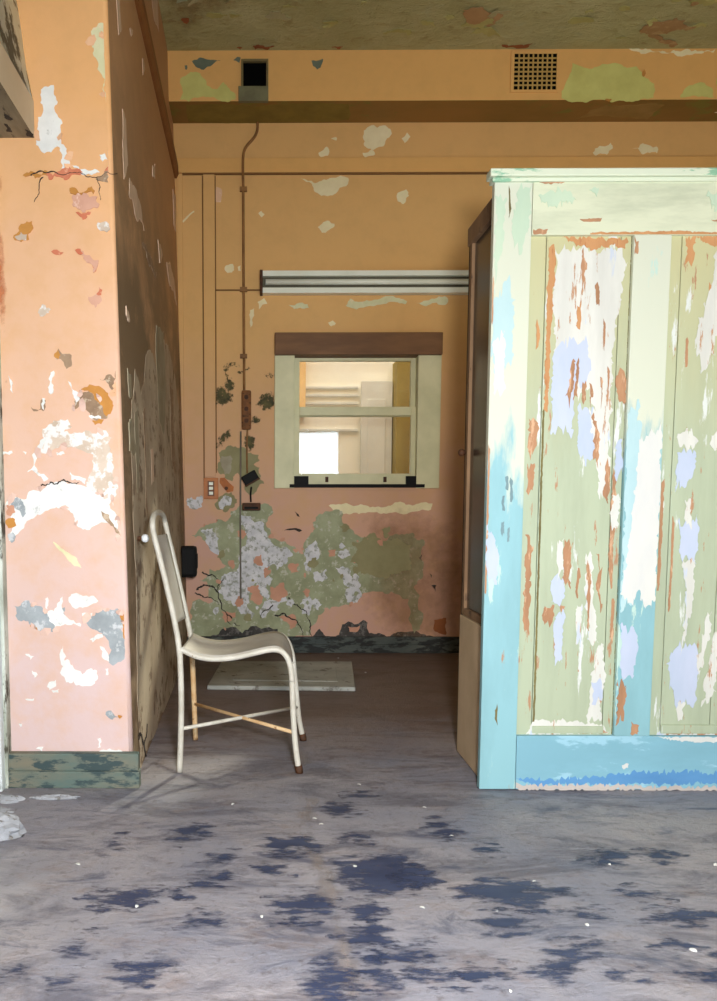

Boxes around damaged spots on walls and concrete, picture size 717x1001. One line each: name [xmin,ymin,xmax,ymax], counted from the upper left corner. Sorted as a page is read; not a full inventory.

peeling [561,63,655,103]
peeling [23,85,110,232]
crack [31,170,117,202]
peeling [301,175,349,196]
spalling [13,221,33,242]
peeling [3,325,447,768]
damp [166,822,214,848]
damp [577,847,690,865]
damp [73,847,243,927]
damp [249,830,609,1001]
damp [613,882,717,982]
damp [109,960,177,989]